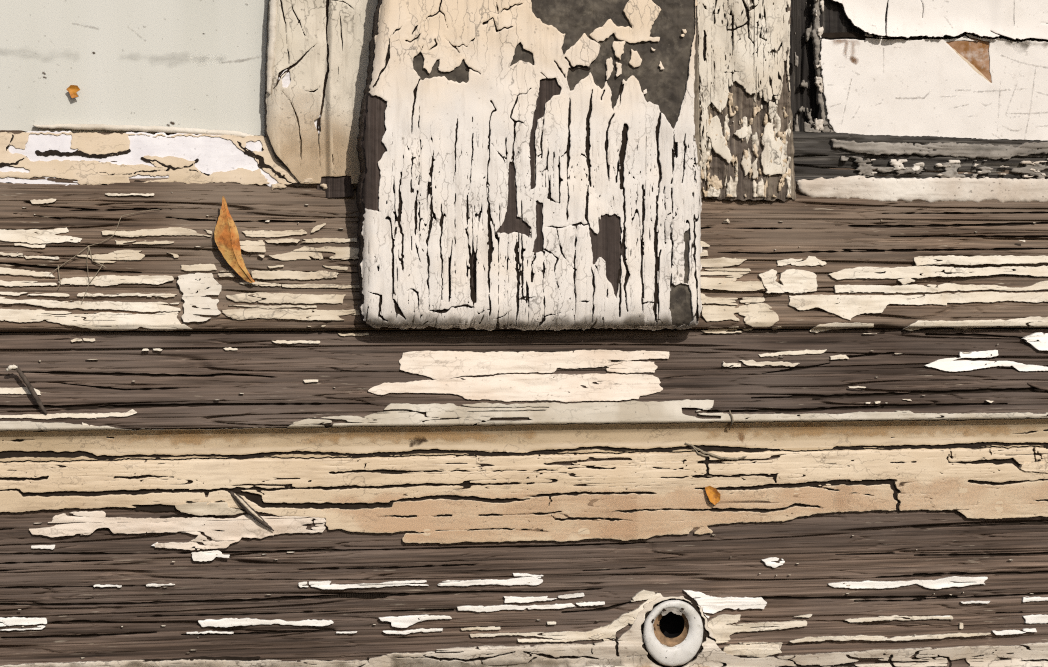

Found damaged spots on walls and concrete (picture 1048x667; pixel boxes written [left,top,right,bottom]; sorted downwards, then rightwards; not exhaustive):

peeling [0,131,281,187]
crack [237,0,352,187]
peeling [494,0,797,255]
crack [368,0,1048,330]
peeling [0,220,360,342]
peeling [669,228,1048,334]
crack [0,371,370,410]
peeling [368,349,670,402]
crack [707,330,1048,414]
peeling [29,500,326,562]
crack [0,429,1048,667]
peeling [298,573,1048,658]